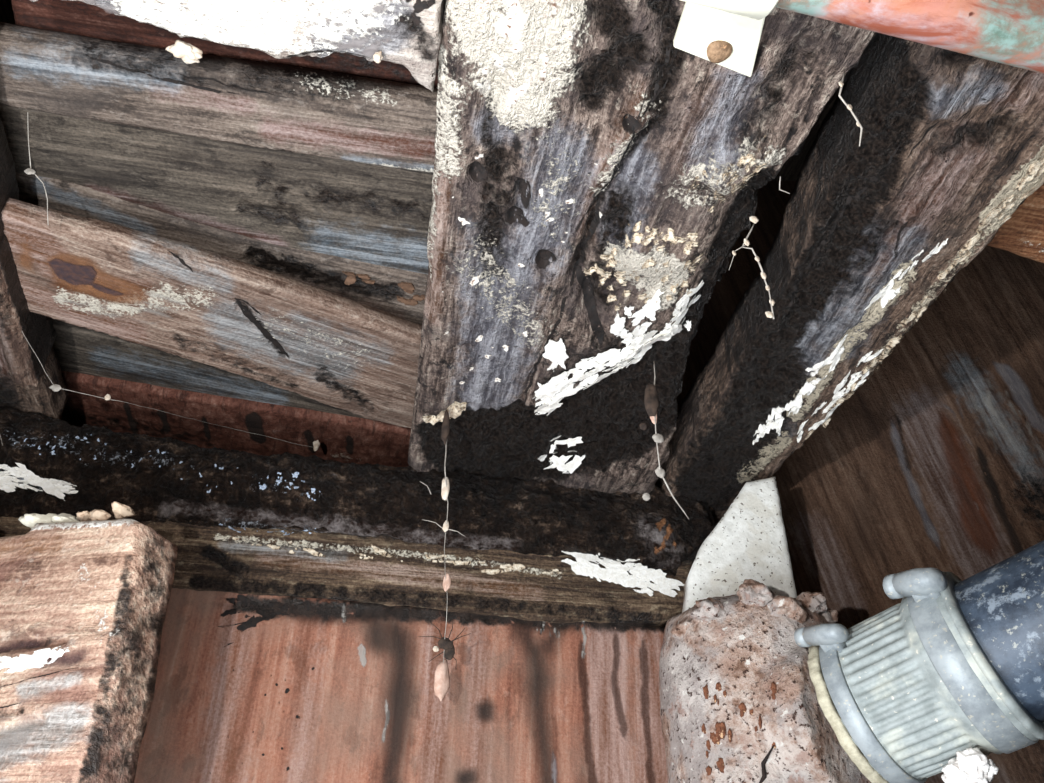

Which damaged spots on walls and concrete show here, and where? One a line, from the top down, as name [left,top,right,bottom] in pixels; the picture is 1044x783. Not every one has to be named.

damp [938,151,1044,290]
damp [584,221,704,311]
damp [864,238,948,311]
peeling [534,280,704,415]
peeling [639,383,660,430]
damp [752,296,928,445]
peeling [0,463,78,501]
damp [259,472,321,501]
peeling [359,545,403,562]
peeling [425,554,525,592]
peeling [542,551,685,597]
damp [270,605,639,783]